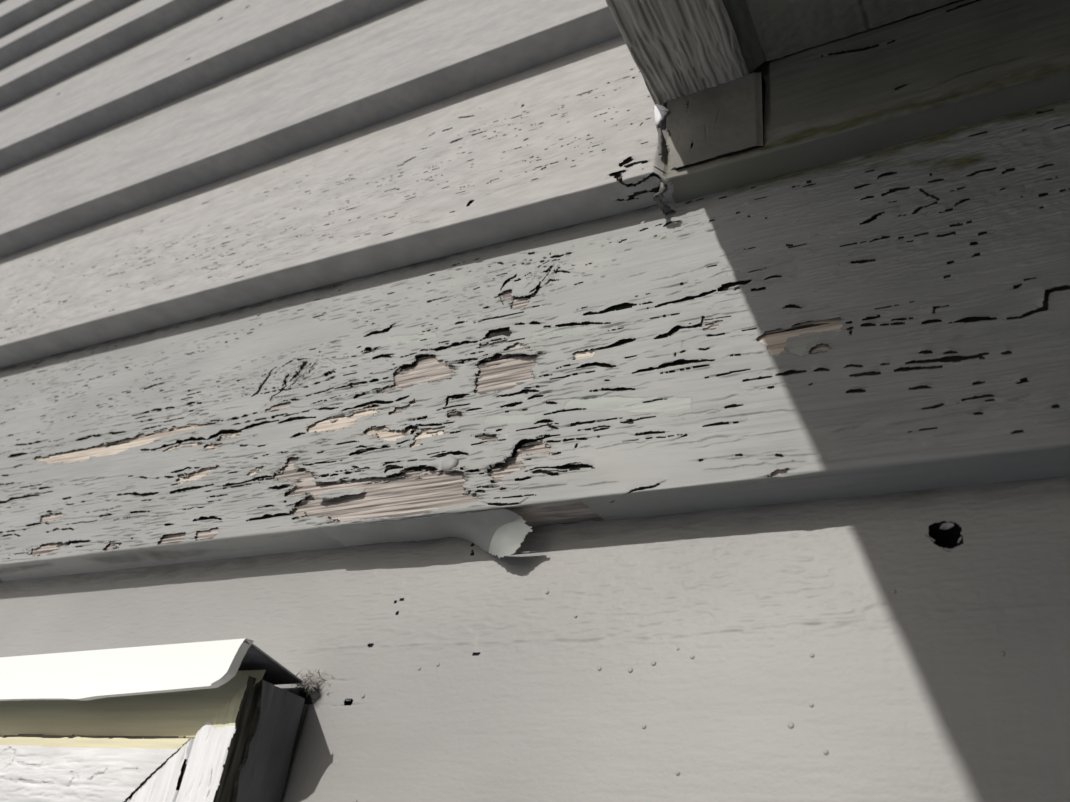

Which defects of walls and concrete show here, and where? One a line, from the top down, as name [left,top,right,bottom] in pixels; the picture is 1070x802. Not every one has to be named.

peeling [654,104,669,126]
peeling [605,154,668,200]
peeling [695,316,727,338]
peeling [750,312,851,362]
peeling [29,417,247,487]
peeling [243,325,692,558]
peeling [757,461,800,482]
peeling [35,506,68,527]
peeling [23,536,70,562]
peeling [99,536,127,554]
peeling [154,522,226,548]
spalling [923,521,964,552]